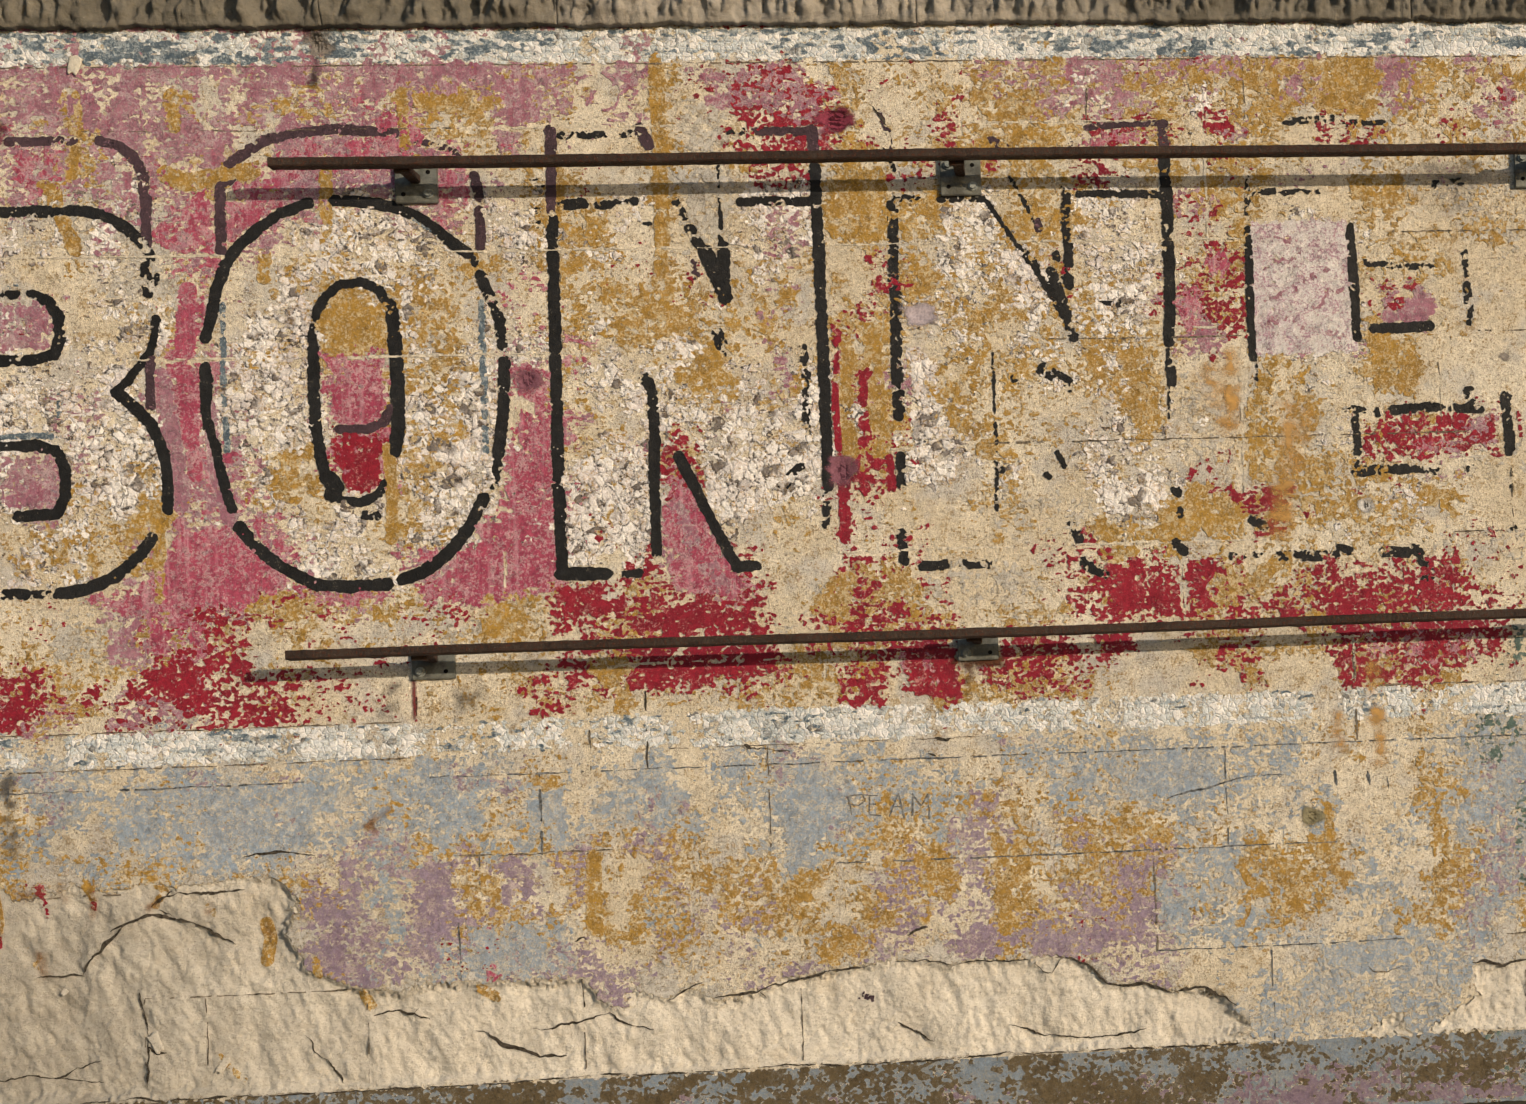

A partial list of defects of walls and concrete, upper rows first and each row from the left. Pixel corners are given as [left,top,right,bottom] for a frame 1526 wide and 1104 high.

peeling [1224,21,1318,41]
peeling [879,38,1526,149]
peeling [405,168,474,242]
peeling [0,290,76,354]
peeling [555,163,818,467]
peeling [1260,266,1345,330]
peeling [1341,155,1526,403]
peeling [565,475,614,555]
peeling [731,496,811,561]
crack [38,850,314,978]
crack [1472,931,1526,967]
crack [0,926,1239,1104]